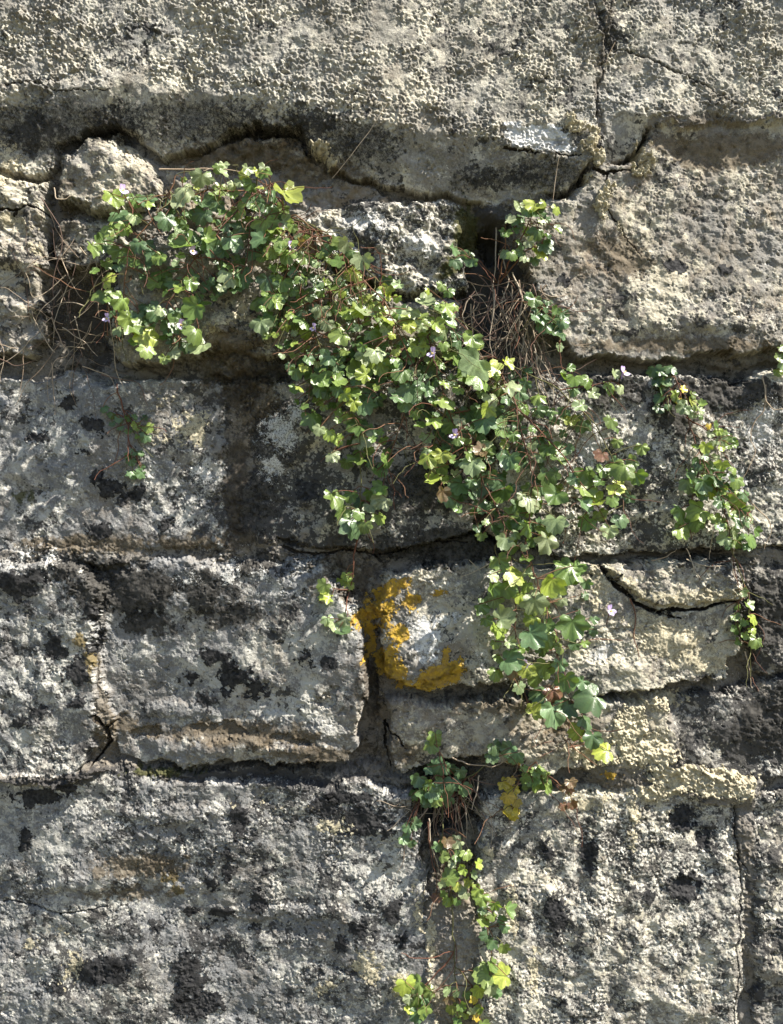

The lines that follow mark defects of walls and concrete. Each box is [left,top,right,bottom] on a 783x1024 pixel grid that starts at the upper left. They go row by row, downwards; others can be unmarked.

crack [594,2,737,115]
crack [596,564,738,619]
crack [90,714,117,768]